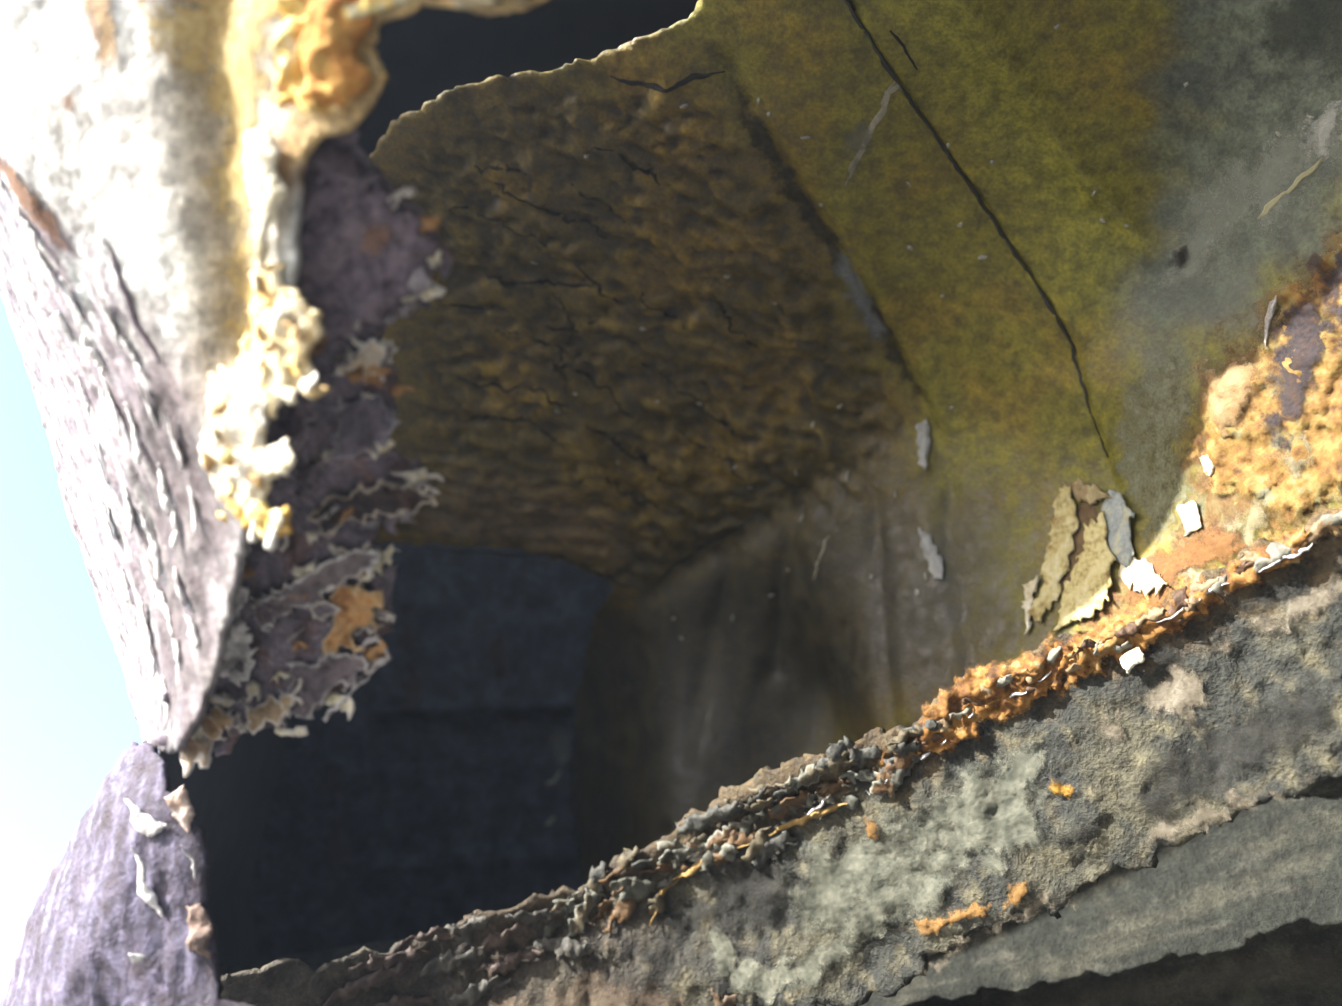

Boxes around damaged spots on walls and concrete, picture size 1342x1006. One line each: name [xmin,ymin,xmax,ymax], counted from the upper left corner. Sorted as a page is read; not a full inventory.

rust [82,0,119,70]
rust [137,0,406,340]
rust [448,0,528,11]
crack [610,71,920,395]
crack [845,0,1109,457]
leakage [1160,101,1342,286]
peeling [0,178,200,735]
peeling [124,127,446,918]
peeling [1021,478,1169,635]
rust [878,229,1342,784]
peeling [185,902,214,959]
rust [1049,783,1073,795]